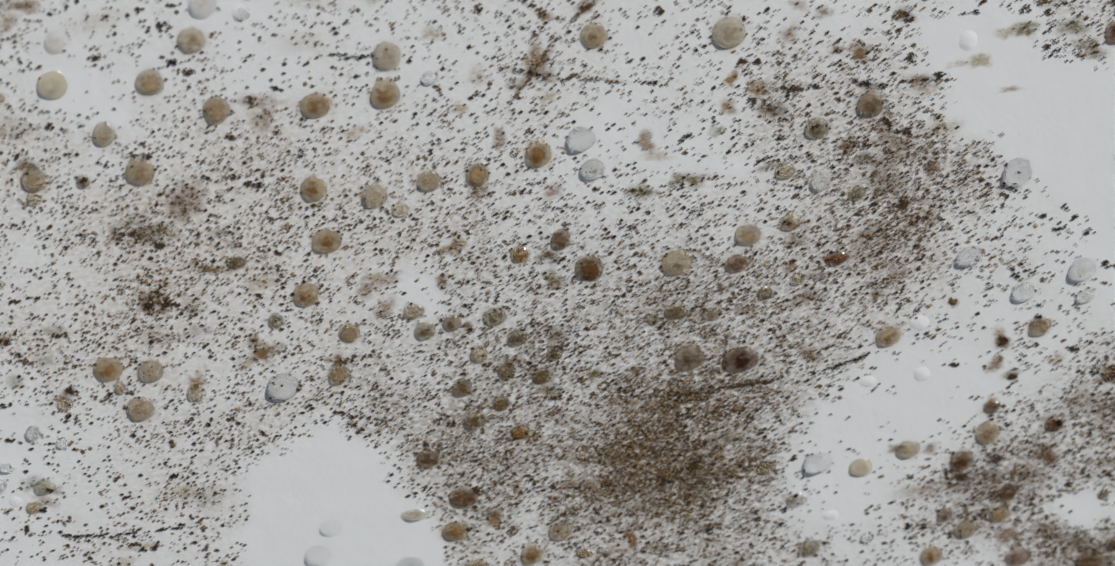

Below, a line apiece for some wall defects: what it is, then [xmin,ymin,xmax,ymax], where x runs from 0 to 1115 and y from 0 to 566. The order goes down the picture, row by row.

damp [269,0,466,59]
mould [1001,0,1115,70]
mould [304,62,401,114]
damp [625,0,733,137]
damp [633,132,654,150]
damp [0,425,63,472]
mould [65,432,127,495]
damp [814,303,1115,566]